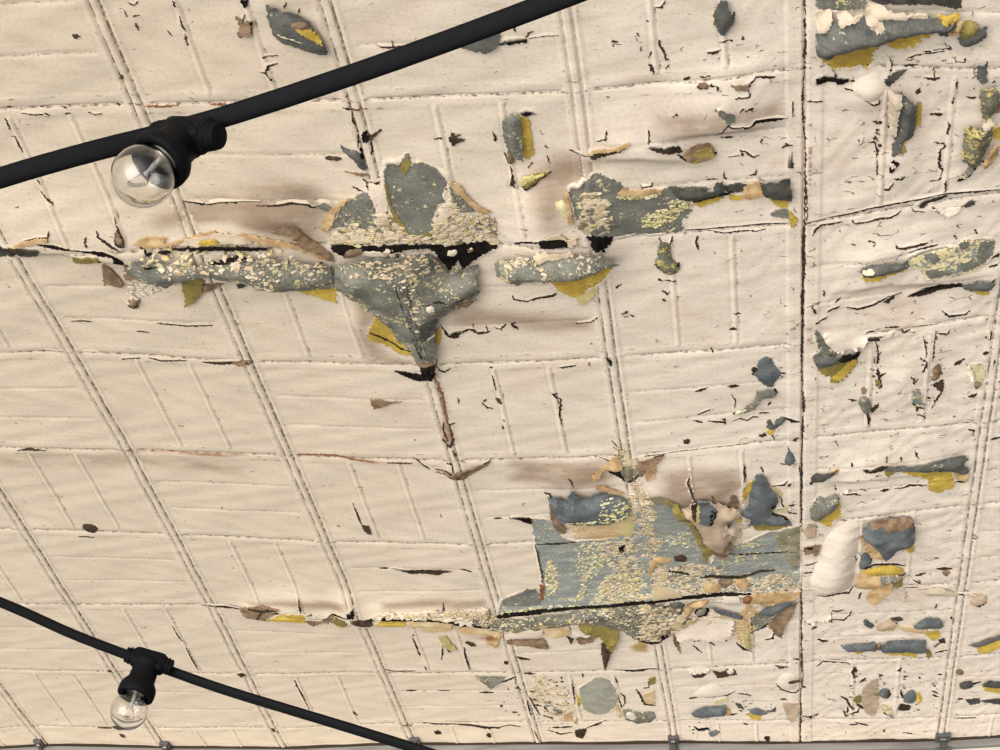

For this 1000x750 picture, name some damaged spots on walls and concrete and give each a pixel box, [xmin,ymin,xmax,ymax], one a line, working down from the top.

peeling [235,0,253,39]
peeling [260,3,328,81]
peeling [809,0,988,88]
peeling [434,132,465,147]
peeling [492,106,551,191]
peeling [72,150,500,382]
peeling [494,169,798,306]
peeling [808,229,1000,425]
crack [200,592,751,670]
peeling [375,443,862,741]
peeling [855,516,925,607]
peeling [839,604,953,738]